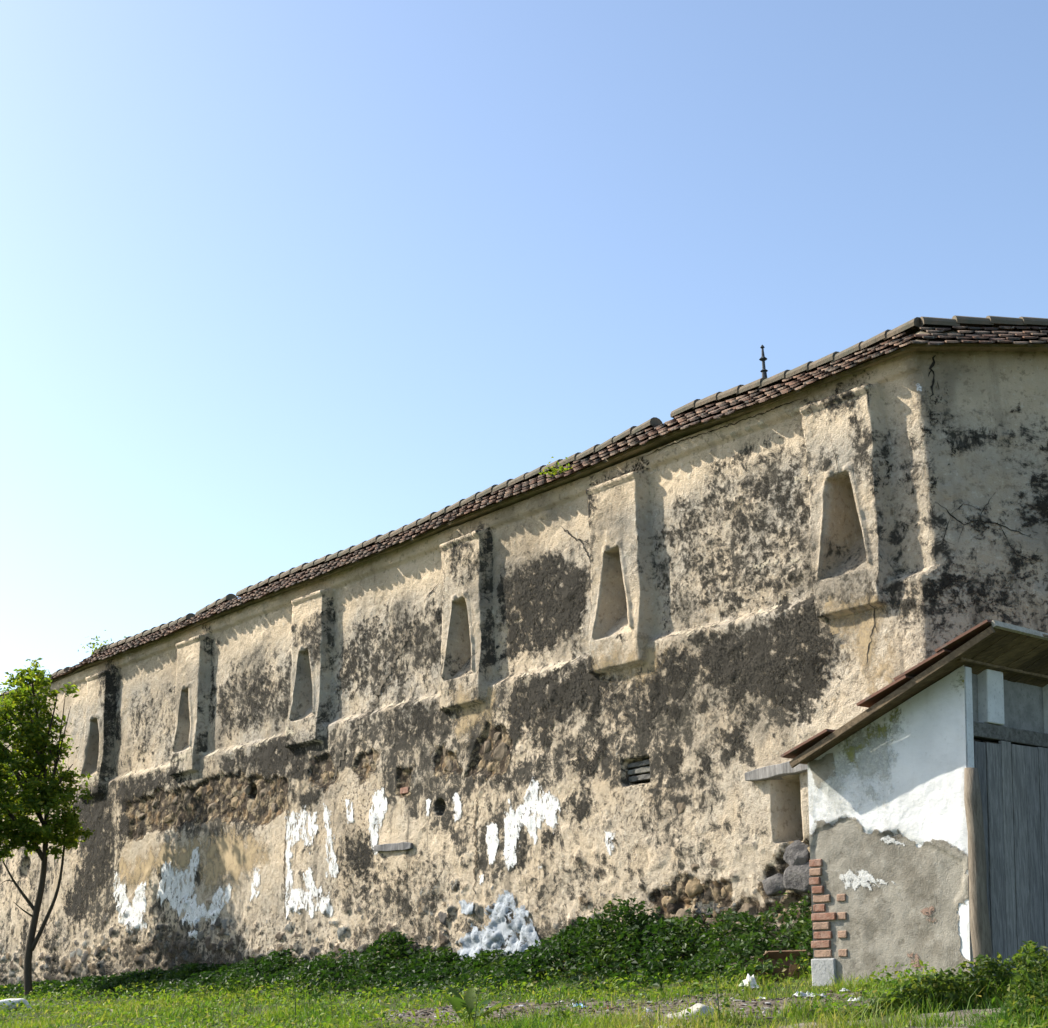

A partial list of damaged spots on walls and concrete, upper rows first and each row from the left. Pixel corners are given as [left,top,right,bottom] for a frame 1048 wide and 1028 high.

crack [937,493,1034,562]
crack [865,578,878,669]
spalling [78,771,132,786]
spalling [149,726,296,774]
spalling [352,742,379,784]
peeling [360,685,561,885]
peeling [809,753,836,788]
peeling [345,798,354,824]
spalling [113,753,339,939]
peeling [604,829,616,856]
peeling [459,899,474,915]
peeling [649,817,970,984]